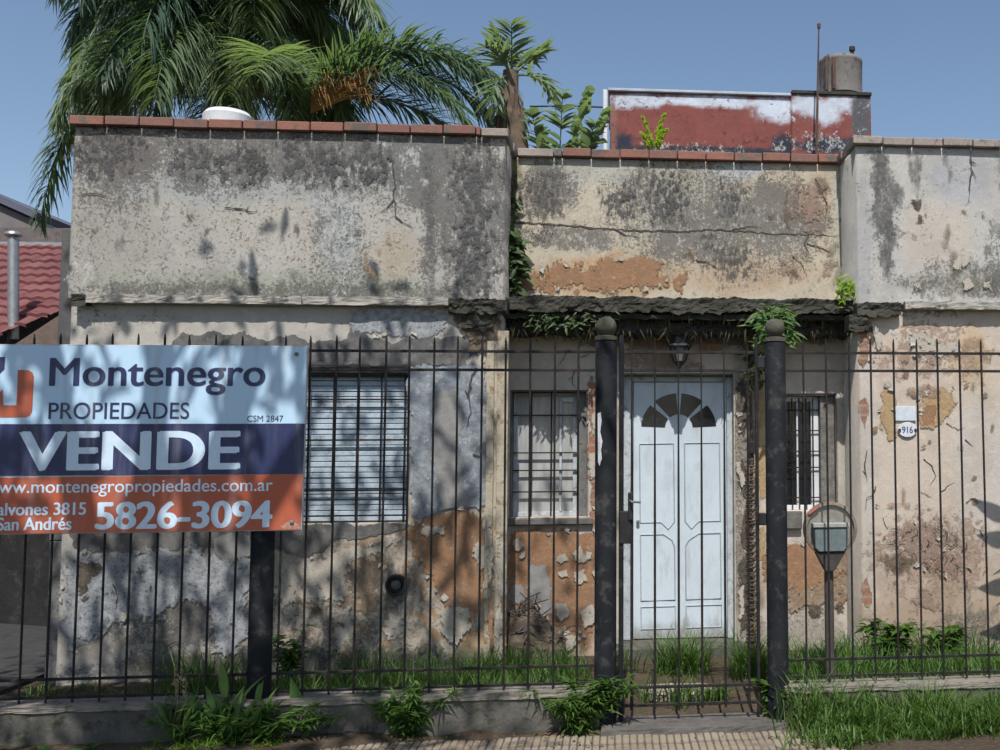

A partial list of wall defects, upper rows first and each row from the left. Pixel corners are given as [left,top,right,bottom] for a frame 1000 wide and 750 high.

water stain [63,126,581,299]
crack [376,157,413,228]
crack [512,179,839,275]
water stain [597,162,764,289]
water stain [868,151,903,277]
peeling [521,256,689,297]
water stain [453,313,504,350]
peeling [858,382,898,441]
peeling [906,382,970,448]
peeling [274,375,595,663]
peeling [58,541,250,664]
peeling [787,541,847,616]